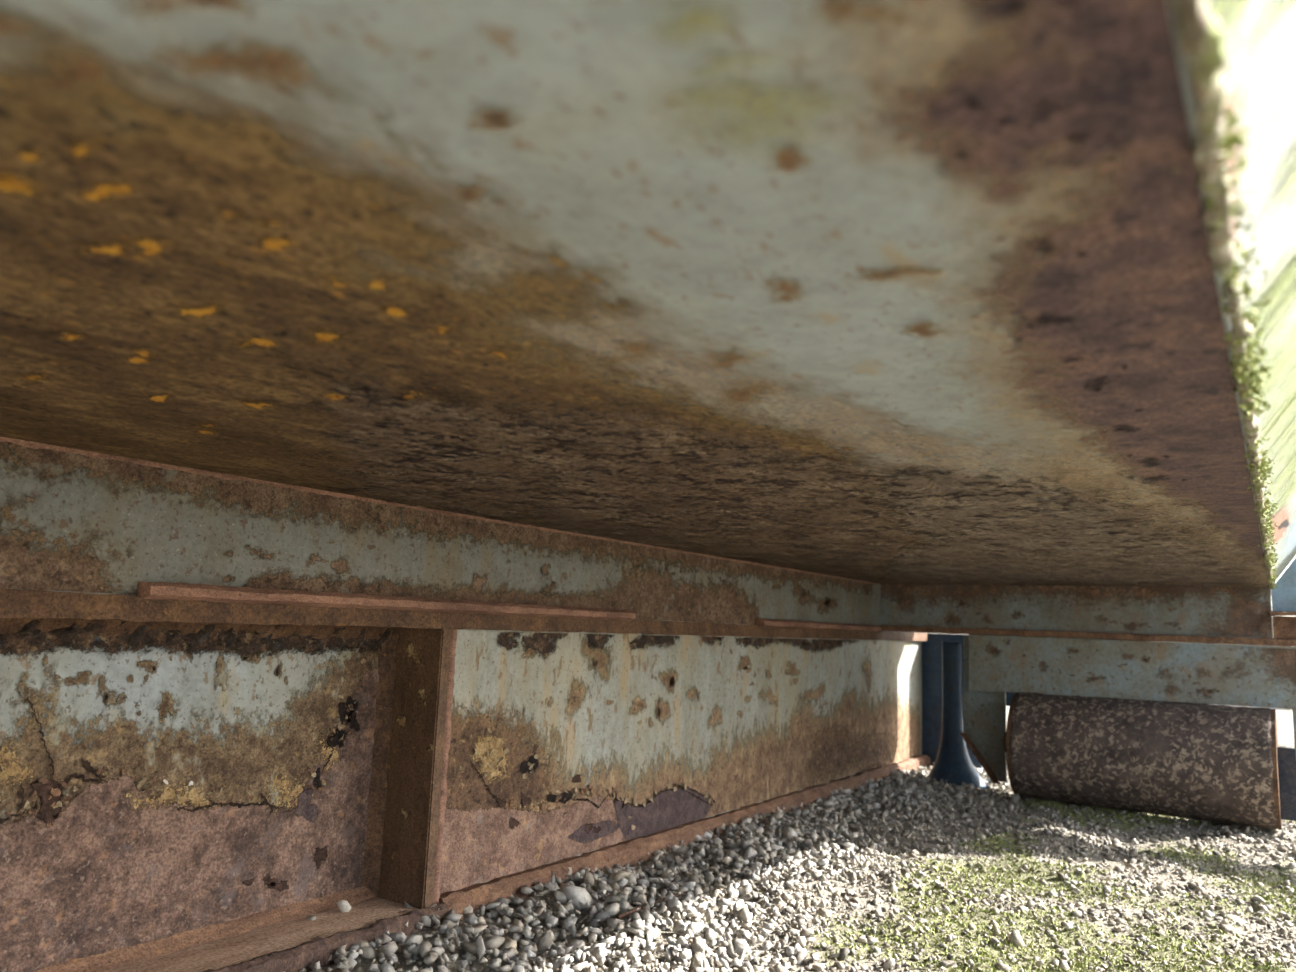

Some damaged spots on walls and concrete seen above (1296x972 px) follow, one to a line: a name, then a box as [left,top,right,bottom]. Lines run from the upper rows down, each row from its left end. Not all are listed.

rust [0,0,1296,720]
rust [17,672,43,730]
crack [0,688,106,824]
peeling [0,645,380,972]
crack [170,793,282,816]
rust [294,788,318,823]
crack [320,713,350,774]
rust [446,637,921,844]